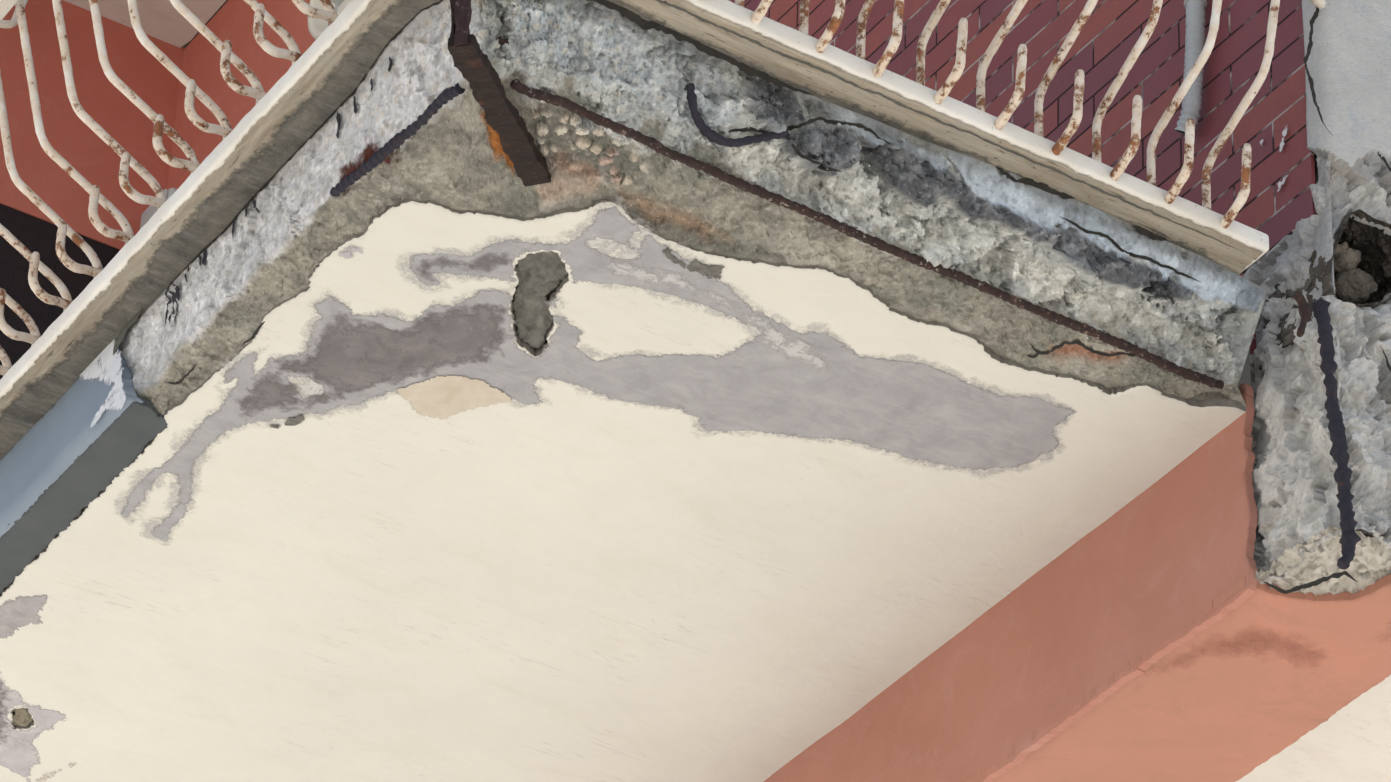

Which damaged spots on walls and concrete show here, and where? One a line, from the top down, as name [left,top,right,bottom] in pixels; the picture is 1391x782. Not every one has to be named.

crack [587,0,891,172]
crack [113,0,443,354]
corrosion [339,144,399,183]
corrosion [481,113,514,171]
spalling [79,0,1391,596]
crack [166,364,197,385]
flaking render [12,708,33,727]